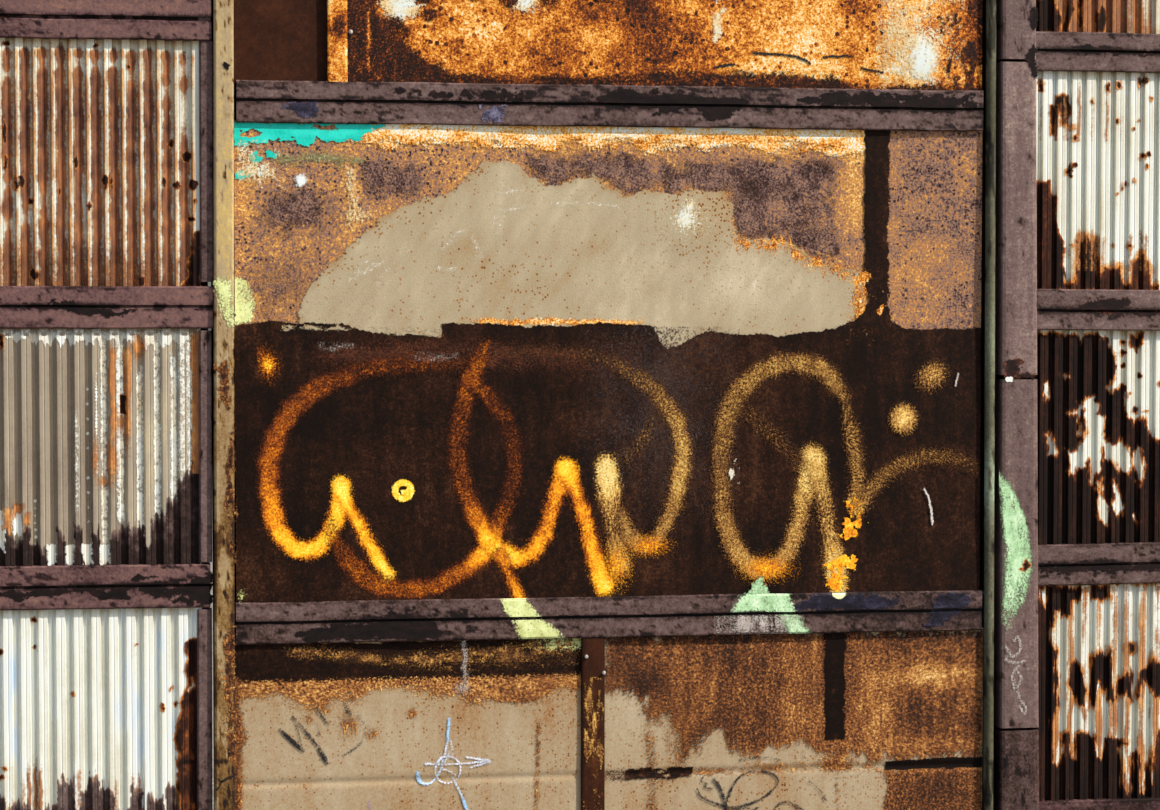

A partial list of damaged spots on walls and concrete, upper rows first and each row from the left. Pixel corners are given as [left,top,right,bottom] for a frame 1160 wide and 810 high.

rust [347,0,983,90]
rust [0,42,195,286]
rust [238,124,893,321]
spalling [1065,162,1078,178]
peeling [1036,179,1160,318]
peeling [0,298,214,607]
peeling [1004,331,1160,545]
peeling [0,767,180,810]
rust [181,698,196,810]
rust [605,630,983,810]
peeling [1029,559,1160,801]